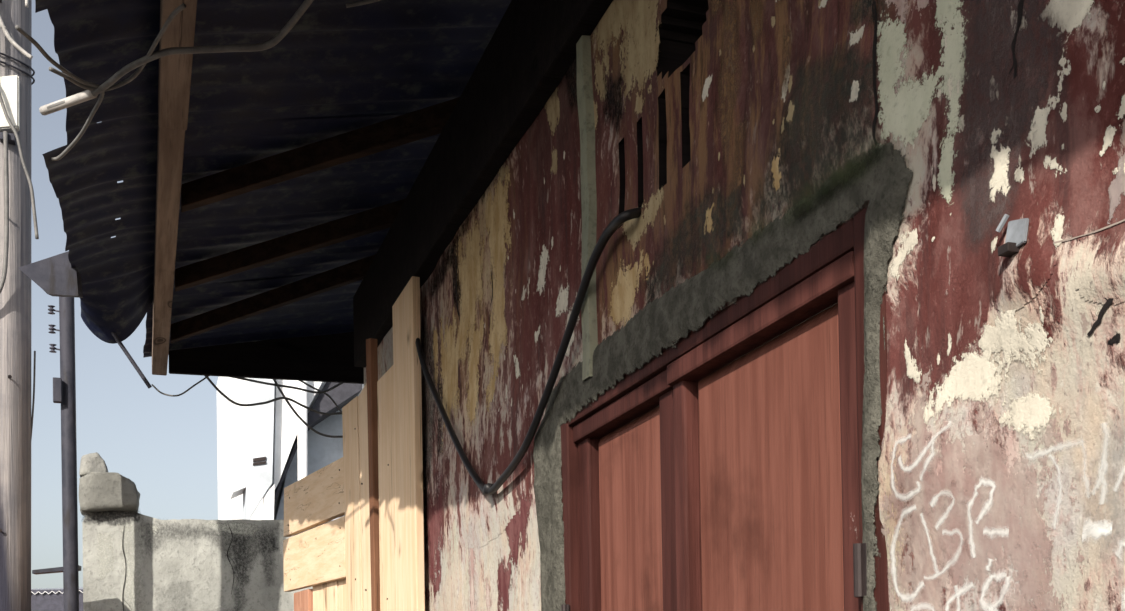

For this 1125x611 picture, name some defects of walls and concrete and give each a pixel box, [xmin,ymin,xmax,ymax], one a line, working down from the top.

damp [603,77,623,130]
peeling [590,0,663,128]
damp [647,48,877,304]
peeling [793,0,969,218]
peeling [989,0,1095,203]
peeling [1099,95,1125,157]
peeling [432,160,580,452]
peeling [607,186,666,326]
peeling [887,229,935,281]
peeling [904,306,1062,478]
crack [122,526,132,611]
peeling [484,557,513,611]